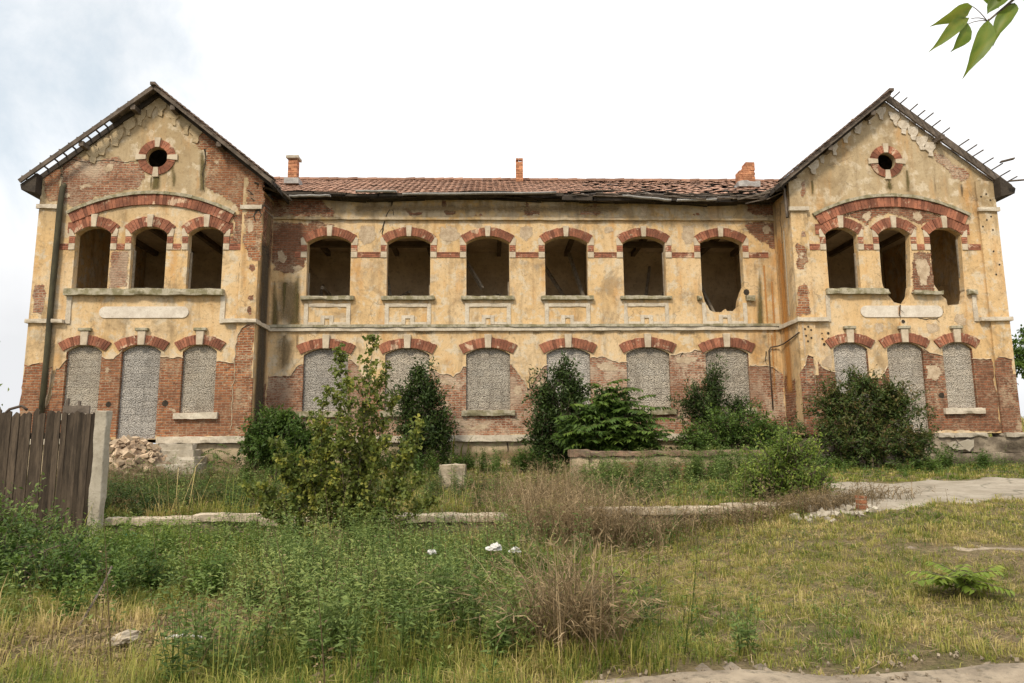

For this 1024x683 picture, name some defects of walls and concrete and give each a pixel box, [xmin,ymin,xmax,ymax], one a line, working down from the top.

spalling [43,98,335,275]
spalling [745,199,777,249]
spalling [795,231,808,269]
spalling [795,283,811,317]
spalling [911,251,934,294]
spalling [97,347,127,437]
spalling [155,295,548,437]
spalling [590,355,628,406]
spalling [636,349,707,434]
spalling [722,355,840,432]
spalling [923,348,1022,451]